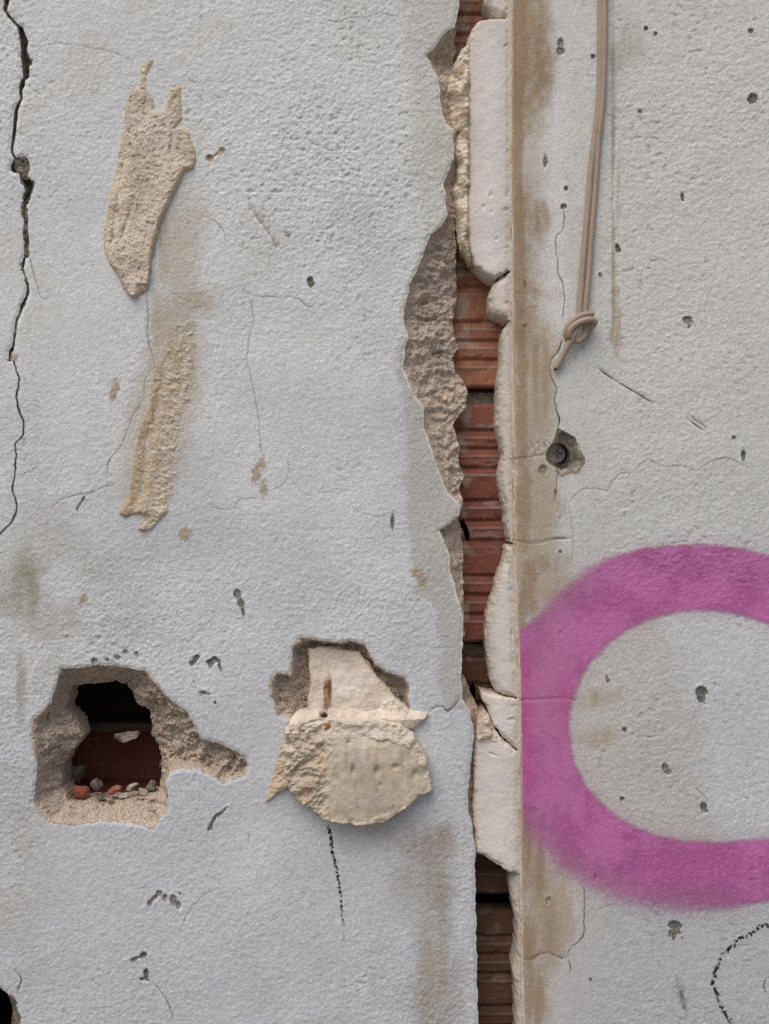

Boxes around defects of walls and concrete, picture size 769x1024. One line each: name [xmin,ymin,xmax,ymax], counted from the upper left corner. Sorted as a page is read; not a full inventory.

crack [0,0,35,534]
flaking render [403,25,474,636]
water stain [514,329,552,441]
flaking render [520,428,585,477]
spalling [30,650,249,830]
corrosion [324,681,332,708]
flaking render [269,636,410,718]
flaking render [461,674,514,862]